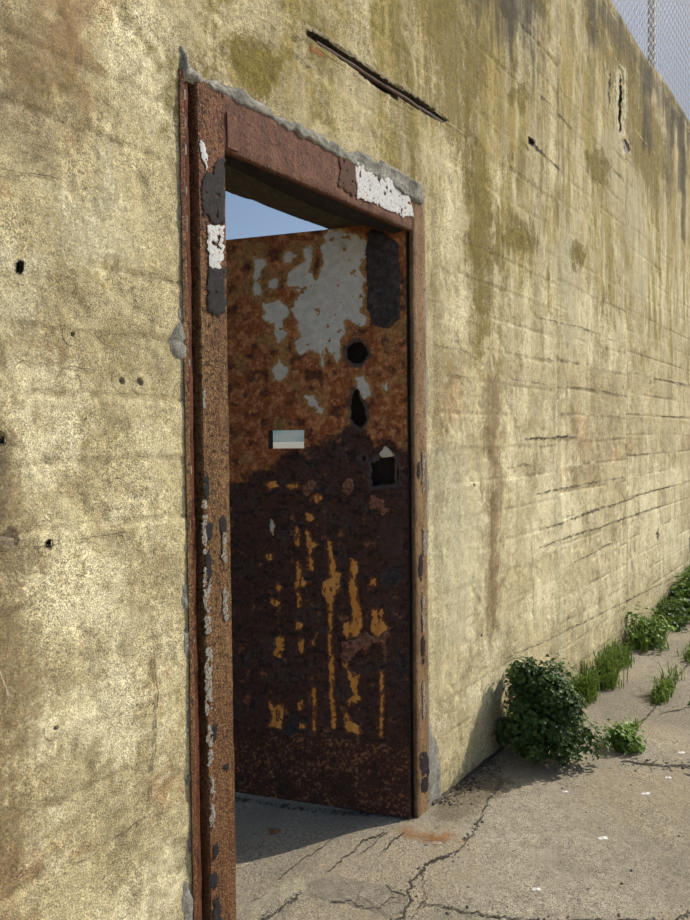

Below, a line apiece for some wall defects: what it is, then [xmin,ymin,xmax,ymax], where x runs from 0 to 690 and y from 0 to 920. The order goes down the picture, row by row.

leakage [487,0,542,48]
leakage [588,0,690,192]